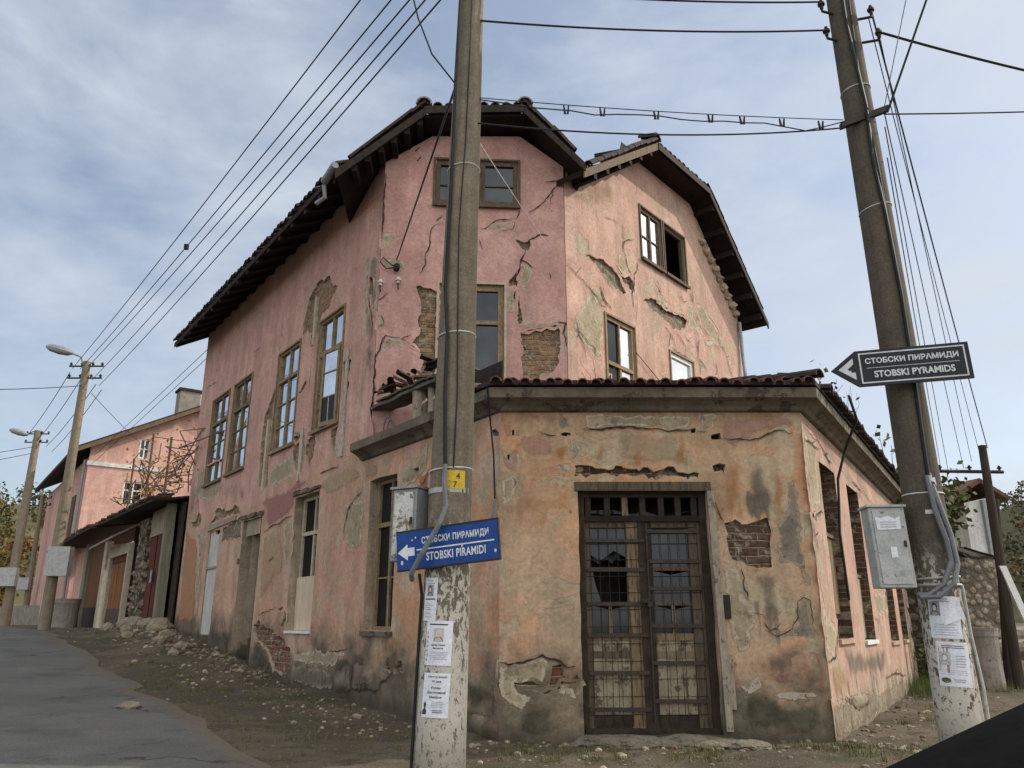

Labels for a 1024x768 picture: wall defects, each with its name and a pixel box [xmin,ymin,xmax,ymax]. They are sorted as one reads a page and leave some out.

spalling [302,273,339,350]
spalling [363,229,441,381]
crack [420,215,443,273]
crack [479,180,733,379]
spalling [484,218,728,380]
spalling [551,459,729,482]
leakage [747,473,769,521]
spalling [720,428,838,664]
spalling [252,603,350,694]
peeling [494,651,586,715]
crack [741,568,840,662]